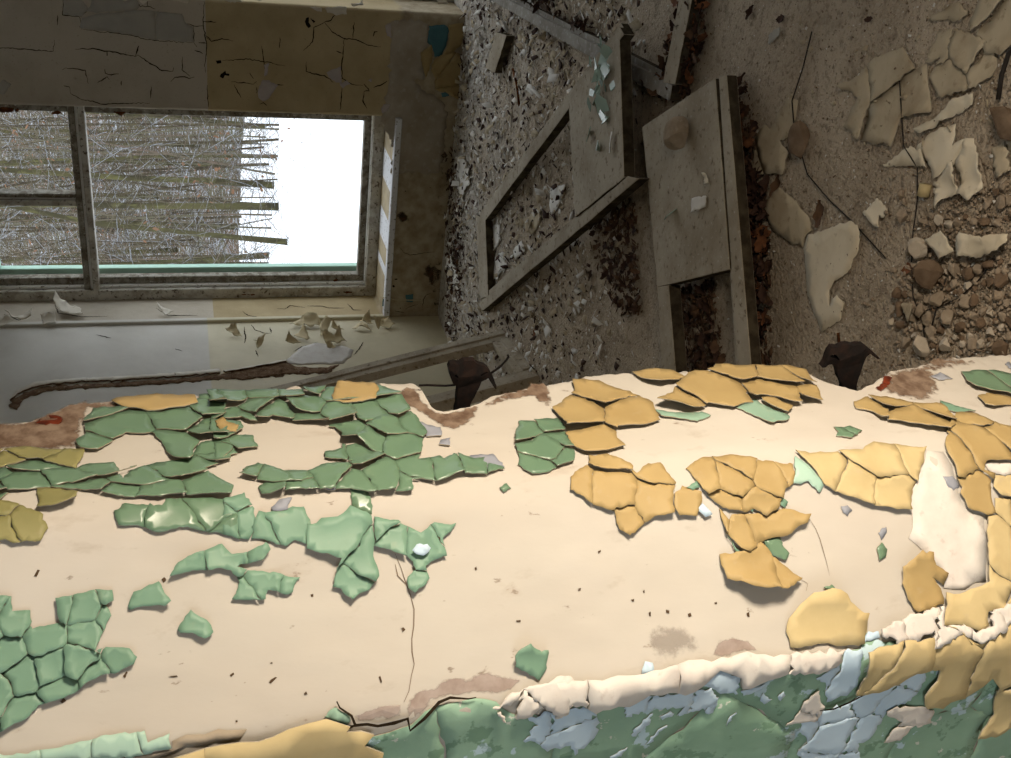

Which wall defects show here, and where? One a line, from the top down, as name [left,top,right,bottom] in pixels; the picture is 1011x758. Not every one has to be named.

crack [10,2,387,109]
flaking render [380,18,464,175]
peeling [0,291,83,326]
peeling [10,299,395,400]
peeling [0,359,1011,758]